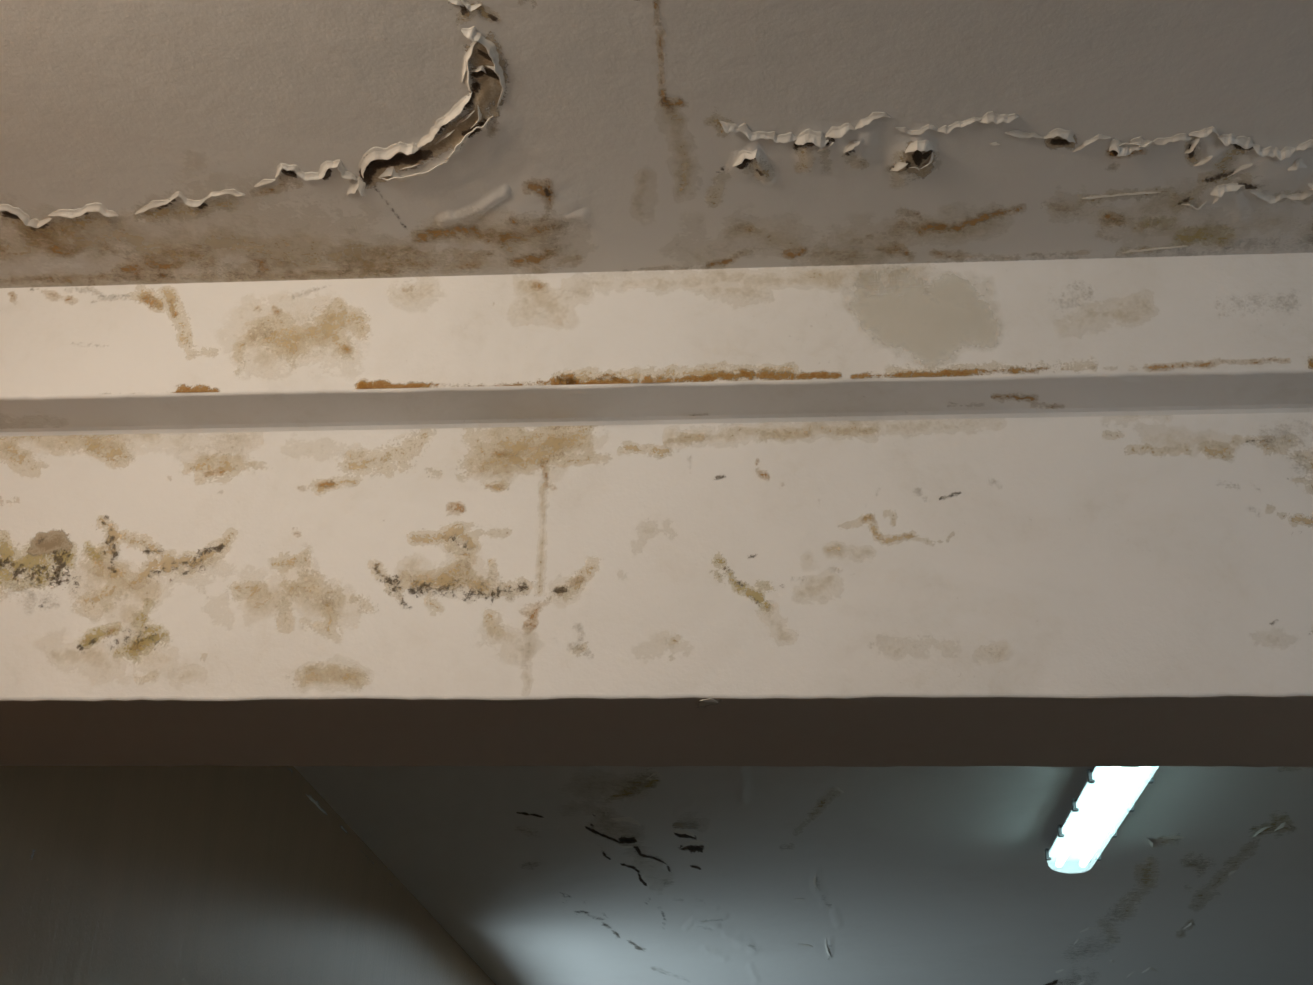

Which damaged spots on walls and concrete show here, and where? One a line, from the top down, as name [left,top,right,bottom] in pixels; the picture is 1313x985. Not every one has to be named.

peeling [135,0,526,215]
peeling [714,111,1313,229]
peeling [0,203,119,232]
water stain [392,160,592,289]
water stain [914,206,1022,233]
water stain [91,252,191,341]
water stain [854,275,996,363]
water stain [0,516,230,601]
water stain [77,604,164,659]
water stain [374,563,527,617]
water stain [717,559,768,608]
crack [562,815,671,975]